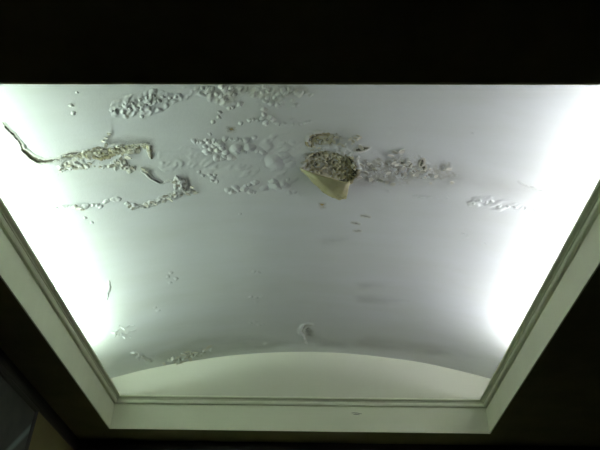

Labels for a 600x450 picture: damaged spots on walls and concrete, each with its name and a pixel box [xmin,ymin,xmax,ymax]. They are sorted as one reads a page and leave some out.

flaking render [53,133,198,224]
peeling [299,129,458,200]